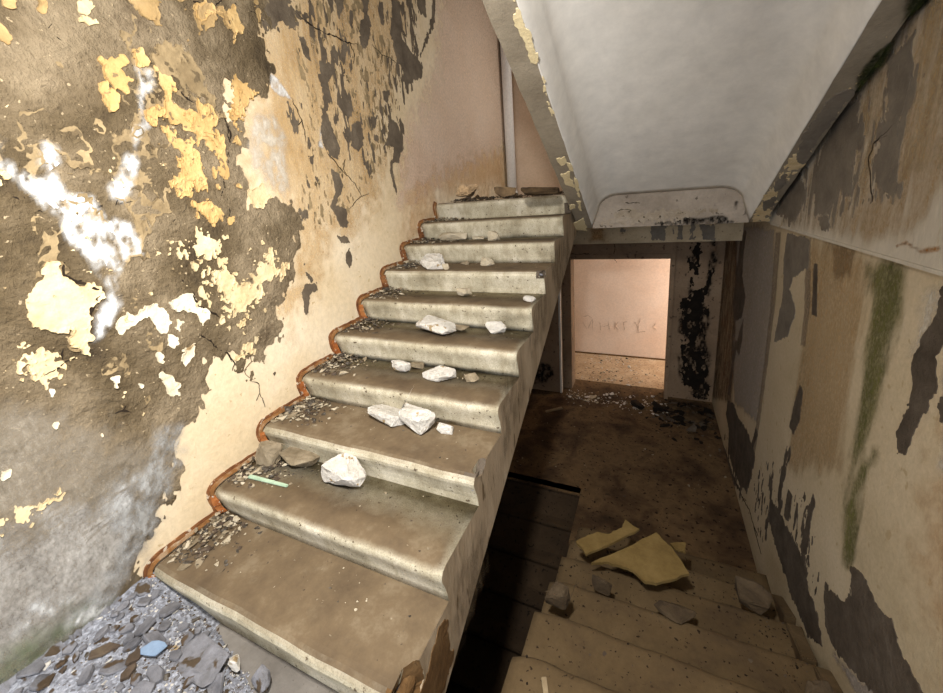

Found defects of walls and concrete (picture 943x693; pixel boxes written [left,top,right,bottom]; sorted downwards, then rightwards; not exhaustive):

peeling [513,0,539,64]
efflorescence [0,144,141,270]
peeling [556,156,587,231]
efflorescence [97,284,117,337]
peeling [0,0,436,682]
crack [181,279,265,406]
peeling [600,207,718,401]
peeling [723,29,925,693]
peeling [896,286,943,455]